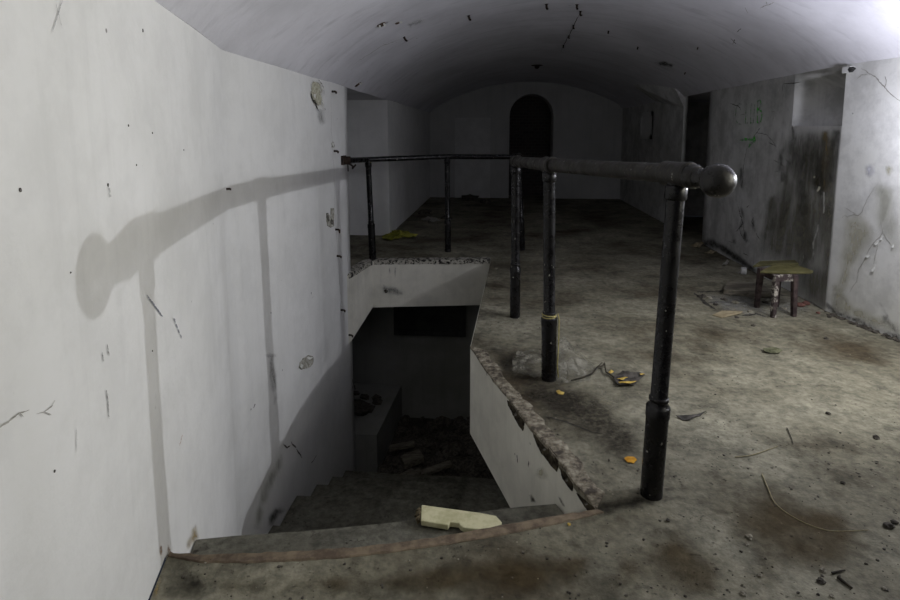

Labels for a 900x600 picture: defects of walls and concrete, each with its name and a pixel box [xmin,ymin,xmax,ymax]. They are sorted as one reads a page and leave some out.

spalling [311,80,326,118]
crack [857,70,900,101]
leakage [765,132,887,324]
spalling [299,355,314,370]
crack [1,405,53,427]
spalling [507,400,597,510]